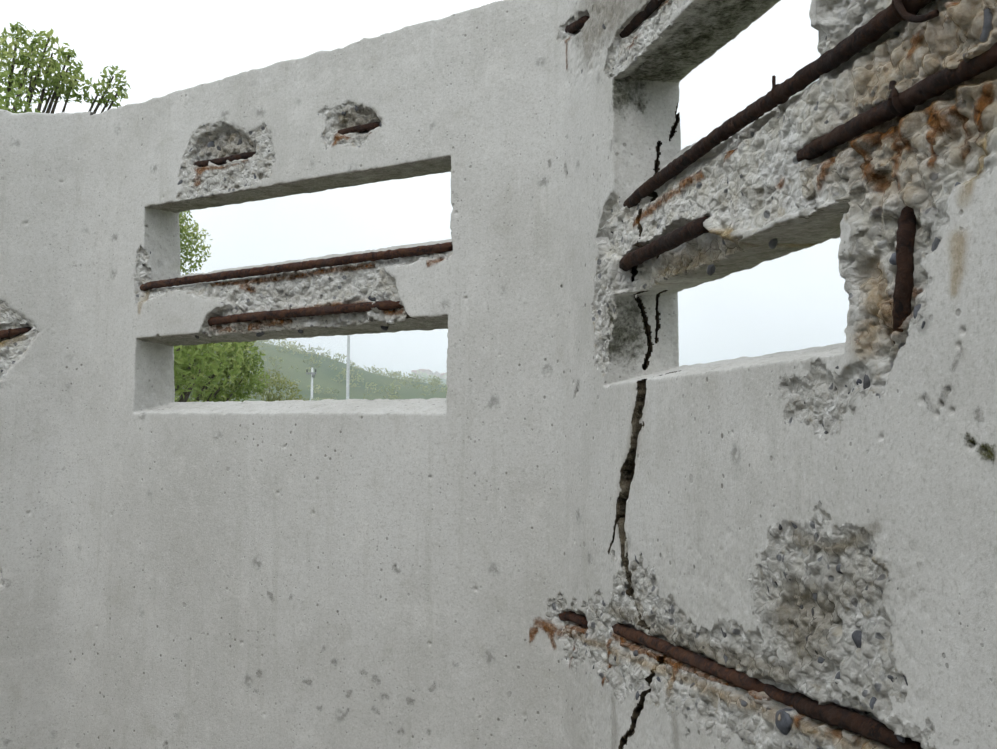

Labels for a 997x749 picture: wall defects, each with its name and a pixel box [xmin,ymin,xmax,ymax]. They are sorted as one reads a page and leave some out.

spalling [175,119,276,201]
spalling [318,100,382,149]
corrosion [633,171,704,227]
spalling [591,0,997,441]
corrosion [850,117,911,192]
corrosion [925,84,993,166]
corrosion [211,264,375,293]
spalling [134,232,453,339]
spalling [0,301,39,382]
crack [608,102,682,749]
corrosion [529,618,588,650]
spalling [545,500,936,749]